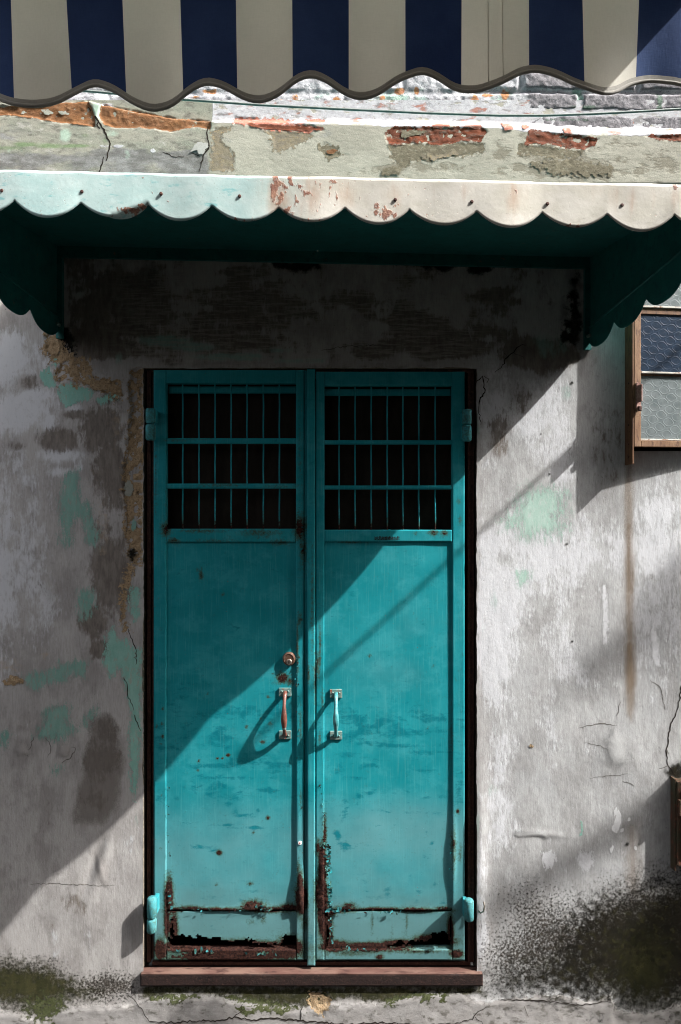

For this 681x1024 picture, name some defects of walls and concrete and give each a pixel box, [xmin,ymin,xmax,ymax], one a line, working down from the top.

crack [88,107,111,172]
spalling [0,101,344,172]
crack [163,128,210,171]
peeling [381,123,487,176]
peeling [501,123,614,179]
spalling [38,332,144,634]
crack [124,629,141,731]
crack [650,680,681,774]
water stain [77,717,119,823]
water stain [479,869,681,1017]
water stain [0,954,201,1024]